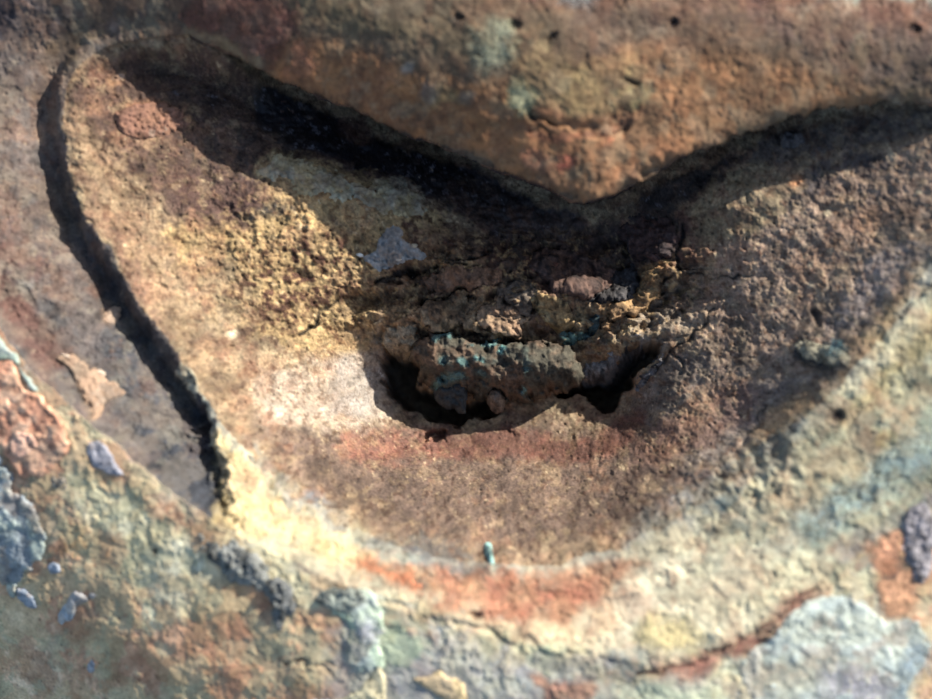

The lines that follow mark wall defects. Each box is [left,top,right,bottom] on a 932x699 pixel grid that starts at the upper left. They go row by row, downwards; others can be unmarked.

rust [185,0,311,66]
leakage [481,23,513,65]
leakage [510,86,532,112]
leakage [560,314,600,346]
peeling [0,338,38,392]
leakage [337,363,374,414]
peeling [87,440,124,475]
leakage [801,446,932,527]
peeling [0,456,61,608]
leakage [484,542,494,565]